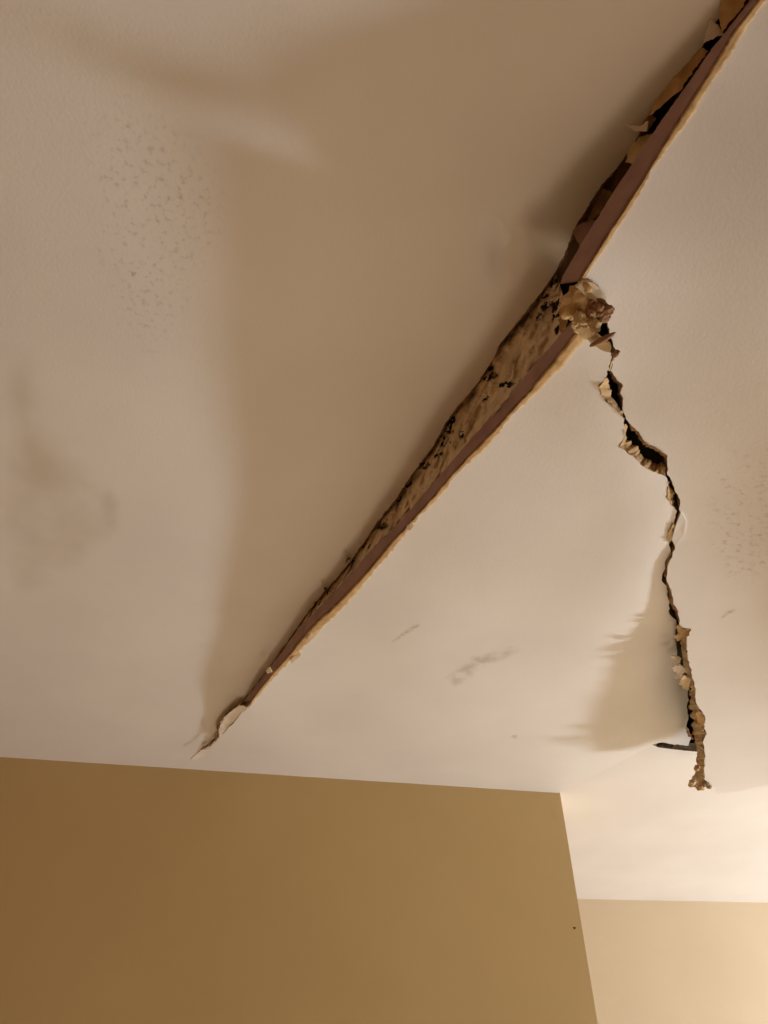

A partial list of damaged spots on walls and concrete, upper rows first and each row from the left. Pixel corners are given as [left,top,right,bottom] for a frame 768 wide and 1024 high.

crack [599,358,712,791]